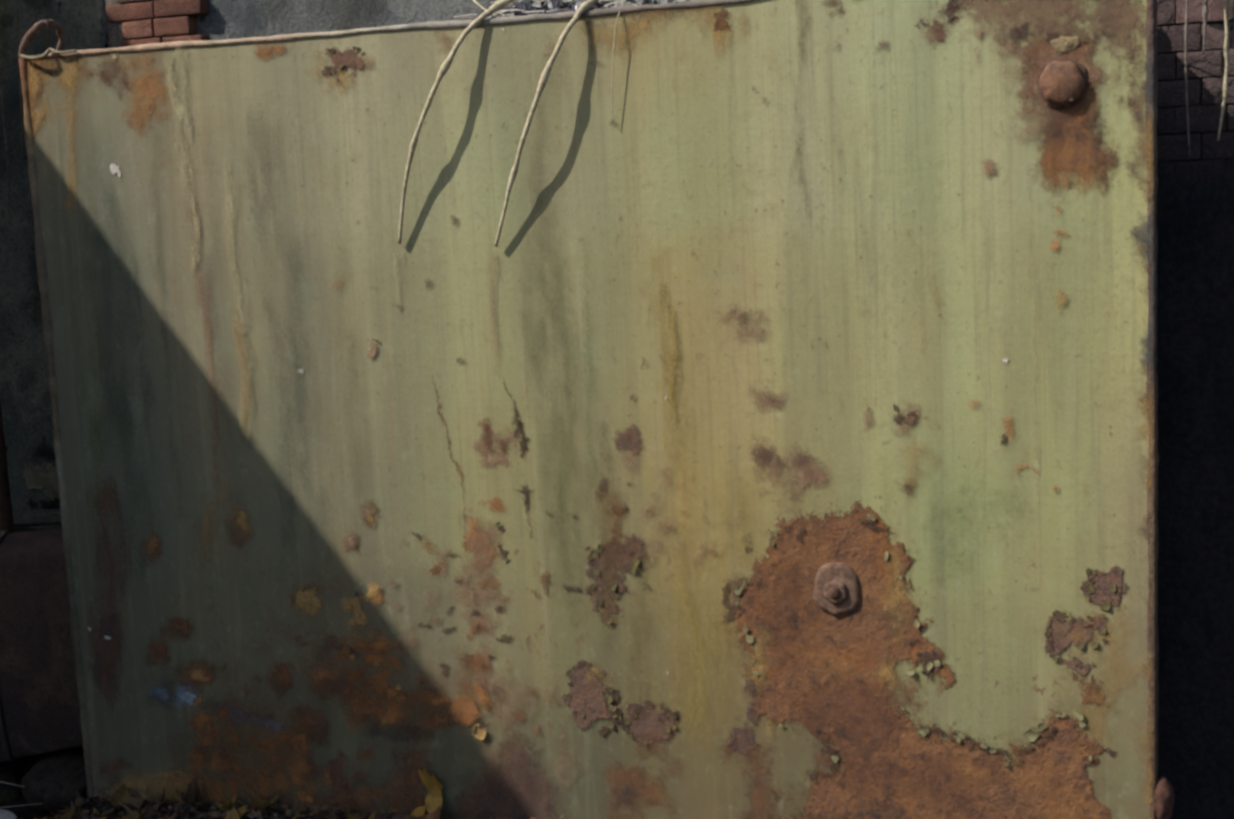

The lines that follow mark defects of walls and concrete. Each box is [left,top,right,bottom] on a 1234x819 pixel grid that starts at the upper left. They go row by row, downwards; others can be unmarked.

rust [28,56,107,209]
rust [917,0,1151,188]
rust [321,498,512,732]
rust [563,530,647,625]
rust [562,660,680,750]
rust [722,501,1128,819]